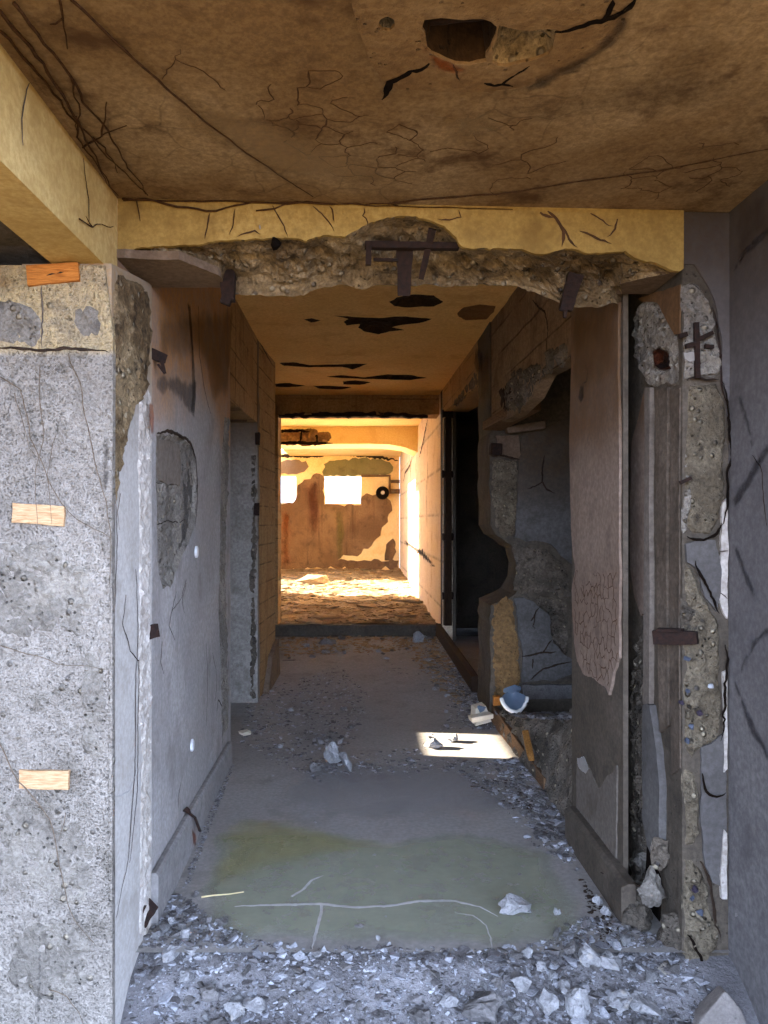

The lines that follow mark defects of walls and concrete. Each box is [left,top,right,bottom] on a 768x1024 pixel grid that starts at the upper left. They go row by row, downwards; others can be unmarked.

spalling [423,18,556,63]
crack [21,83,30,142]
crack [256,63,566,196]
crack [205,205,288,237]
crack [313,206,334,230]
crack [540,211,618,248]
crack [687,307,767,614]
spalling [113,275,197,936]
spalling [136,212,730,961]
crack [522,570,618,686]